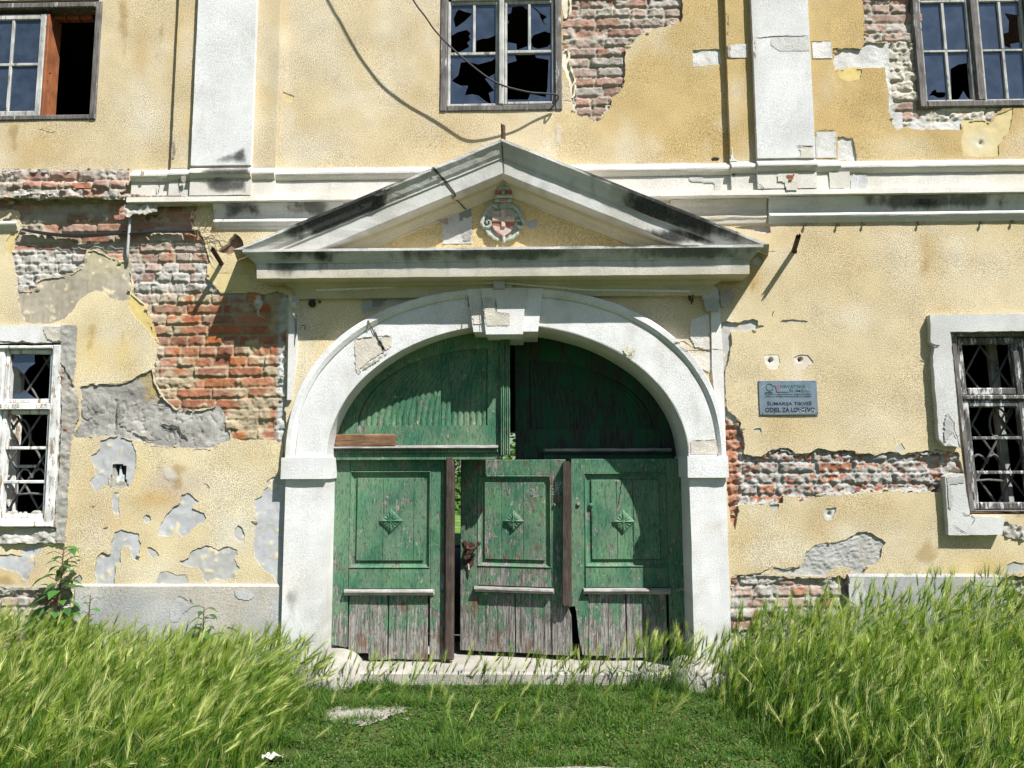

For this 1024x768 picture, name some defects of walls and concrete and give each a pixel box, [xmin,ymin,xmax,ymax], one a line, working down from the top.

flaking render [562,0,682,123]
flaking render [833,0,1013,157]
flaking render [0,168,289,442]
damp [288,178,406,237]
damp [462,249,559,260]
damp [589,173,738,258]
damp [867,194,986,208]
flaking render [690,286,964,528]
flaking render [0,366,82,645]
peeling [95,492,206,584]
peeling [154,475,285,600]
flaking render [730,532,885,641]